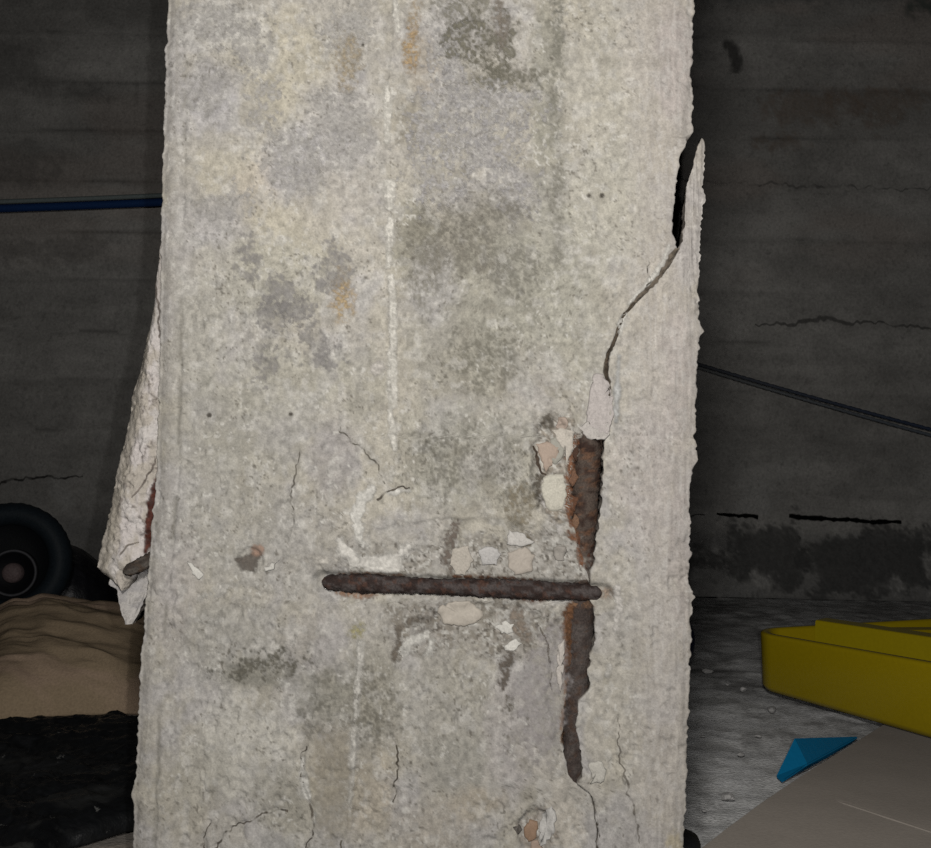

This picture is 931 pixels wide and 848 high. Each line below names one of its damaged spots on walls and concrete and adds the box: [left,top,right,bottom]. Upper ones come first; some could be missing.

crack [603,245,680,423]
spalling [305,373,614,784]
rust [564,435,591,566]
crack [690,512,758,520]
leakage [688,524,931,601]
crack [789,514,901,524]
rust [560,602,588,729]
crack [203,746,315,848]